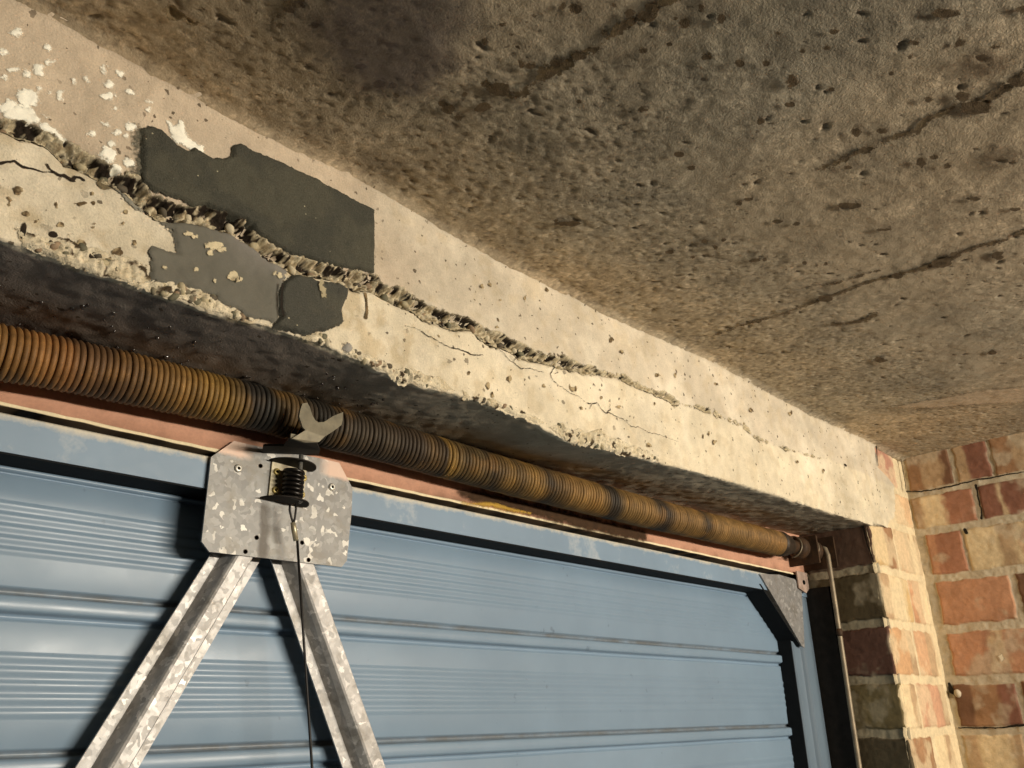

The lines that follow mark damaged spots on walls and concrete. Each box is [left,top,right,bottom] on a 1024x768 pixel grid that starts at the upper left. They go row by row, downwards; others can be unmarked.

crack [820,72,1024,170]
spalling [15,211,267,326]
spalling [295,332,332,347]
crack [0,118,827,459]
crack [713,230,1024,336]